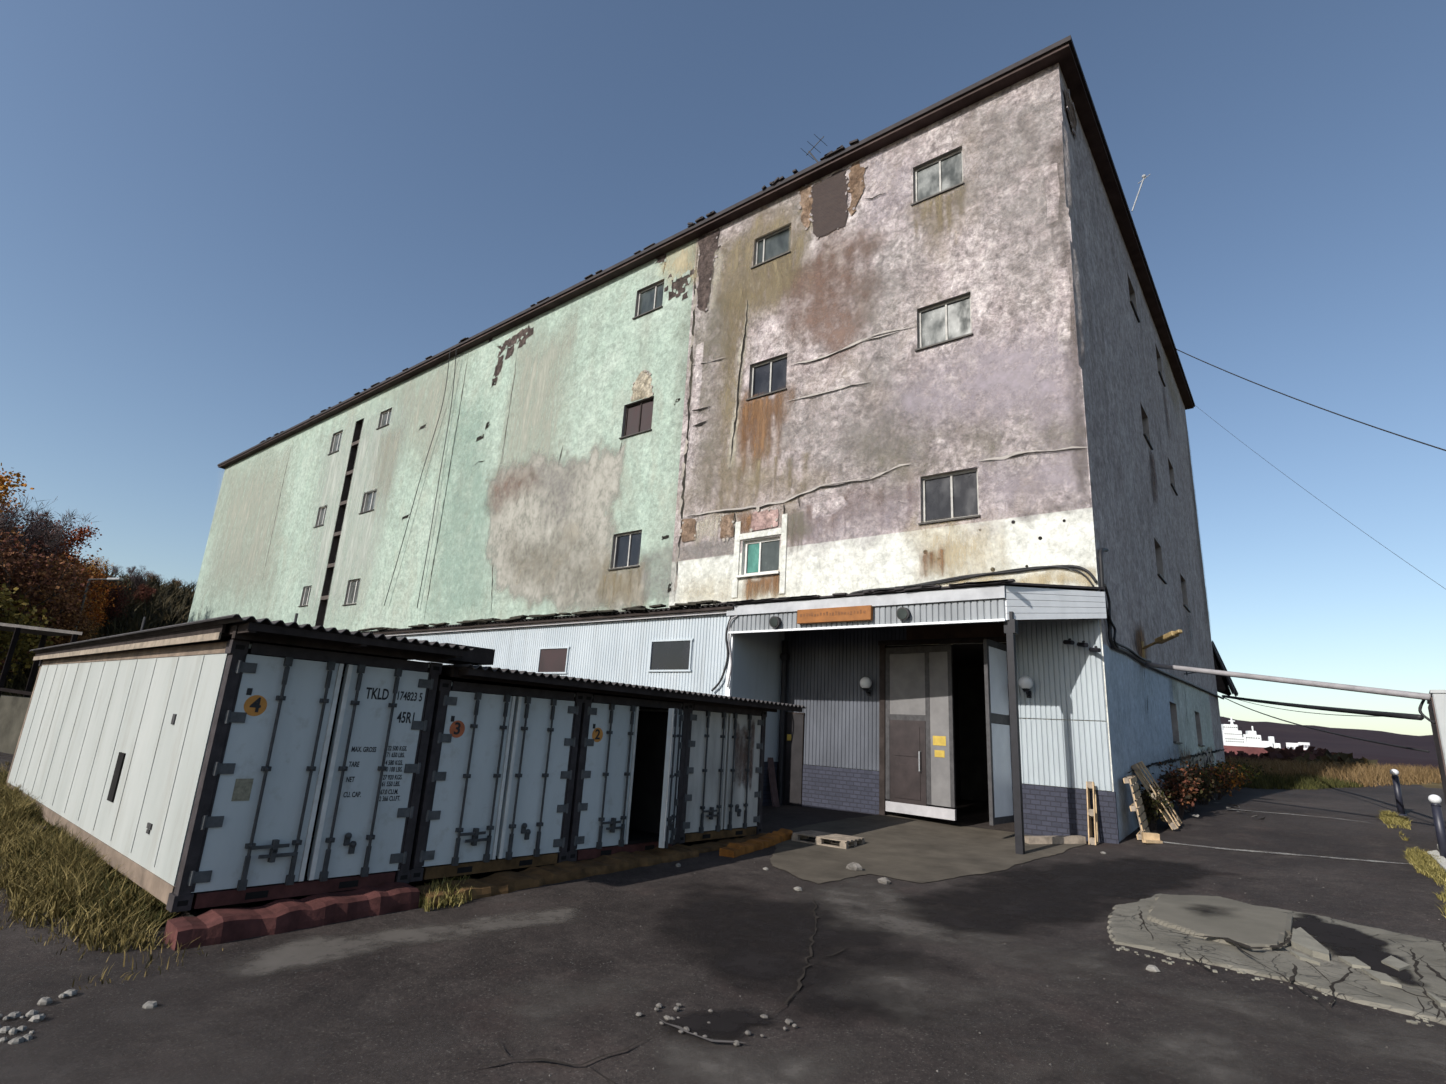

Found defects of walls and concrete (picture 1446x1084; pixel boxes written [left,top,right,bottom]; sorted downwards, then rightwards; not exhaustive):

spalling [798,160,868,238]
spalling [655,228,720,312]
spalling [488,325,534,387]
corrosion [738,393,808,491]
crack [663,238,916,602]
spalling [661,518,696,542]
crack [1139,910,1446,1018]